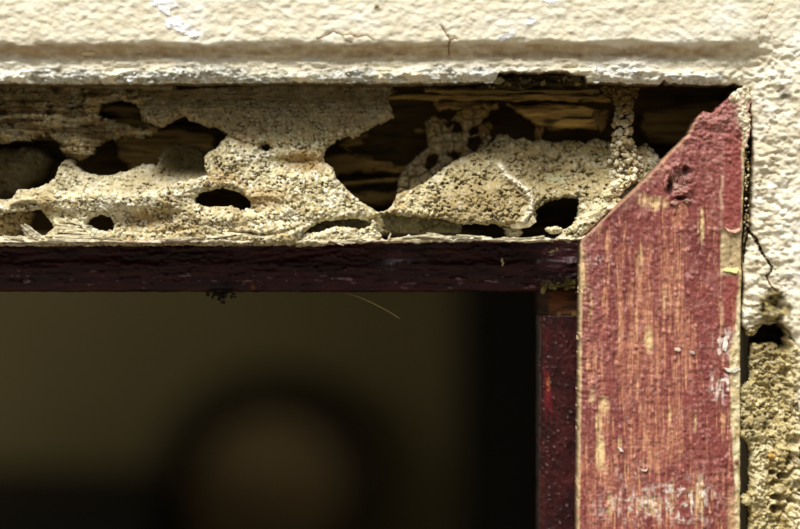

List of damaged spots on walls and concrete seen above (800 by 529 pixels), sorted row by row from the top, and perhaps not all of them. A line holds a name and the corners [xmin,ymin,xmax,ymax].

peeling [22,68,106,85]
peeling [310,70,375,84]
crack [742,142,783,295]
flaking render [724,322,800,529]